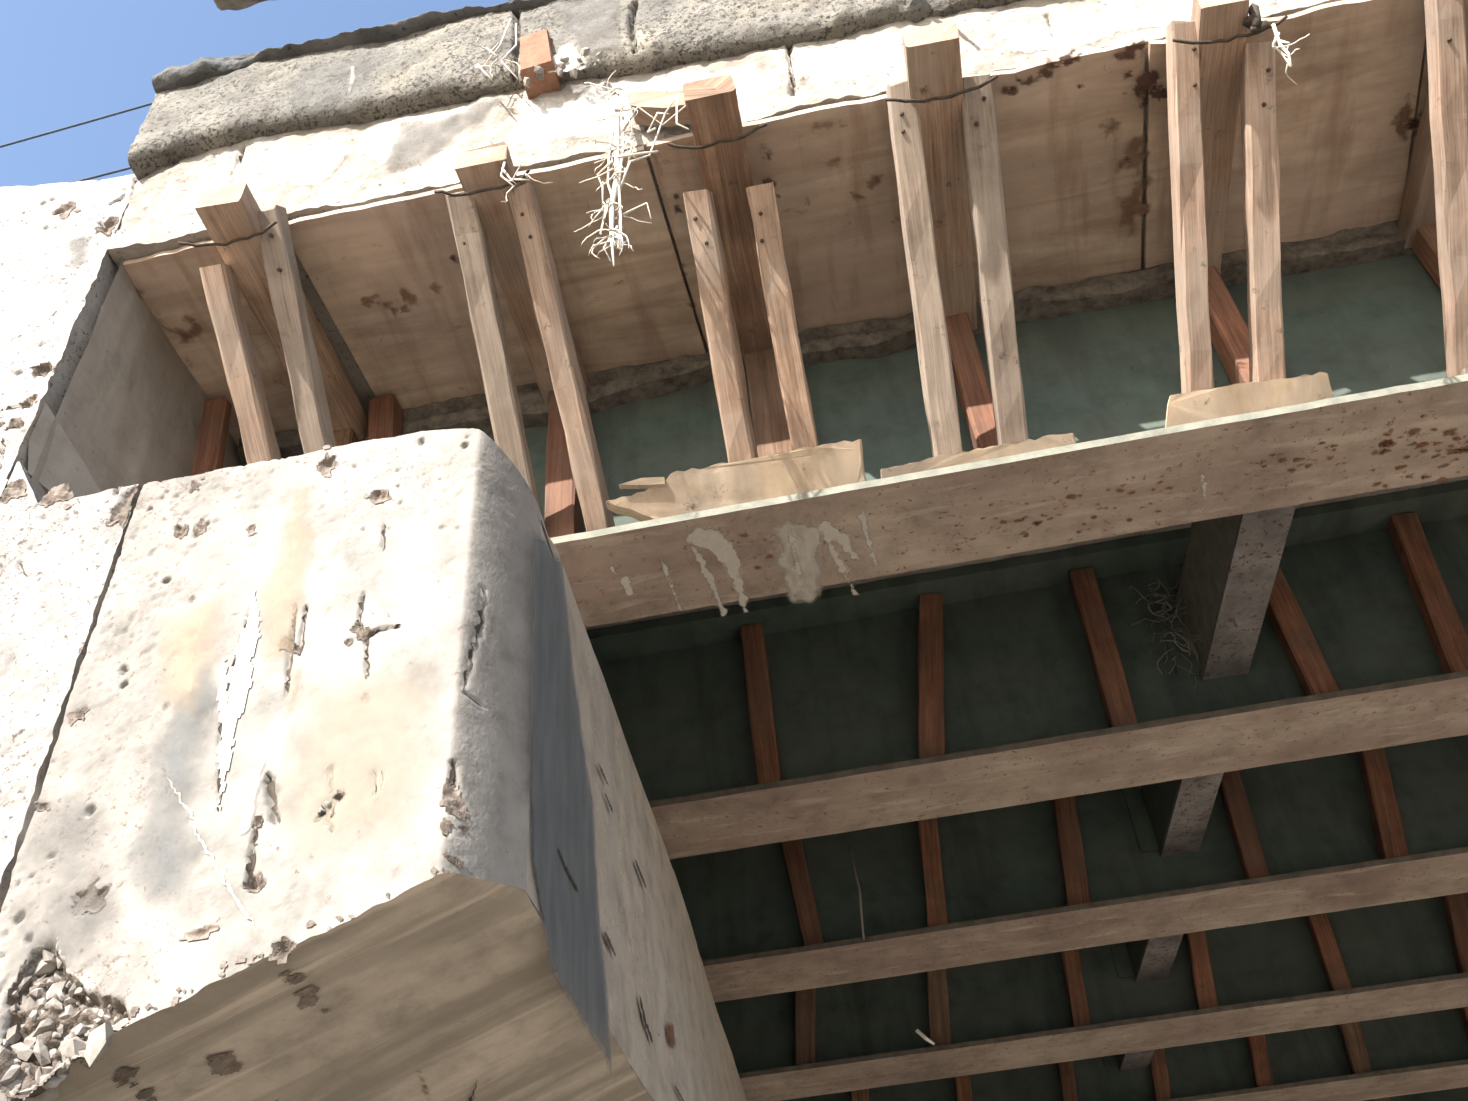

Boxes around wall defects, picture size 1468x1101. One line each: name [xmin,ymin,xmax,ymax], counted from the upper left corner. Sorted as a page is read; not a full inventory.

crack [0,406,20,468]
crack [463,586,485,706]
crack [217,615,249,812]
crack [245,773,281,890]
flaking render [0,949,193,1101]